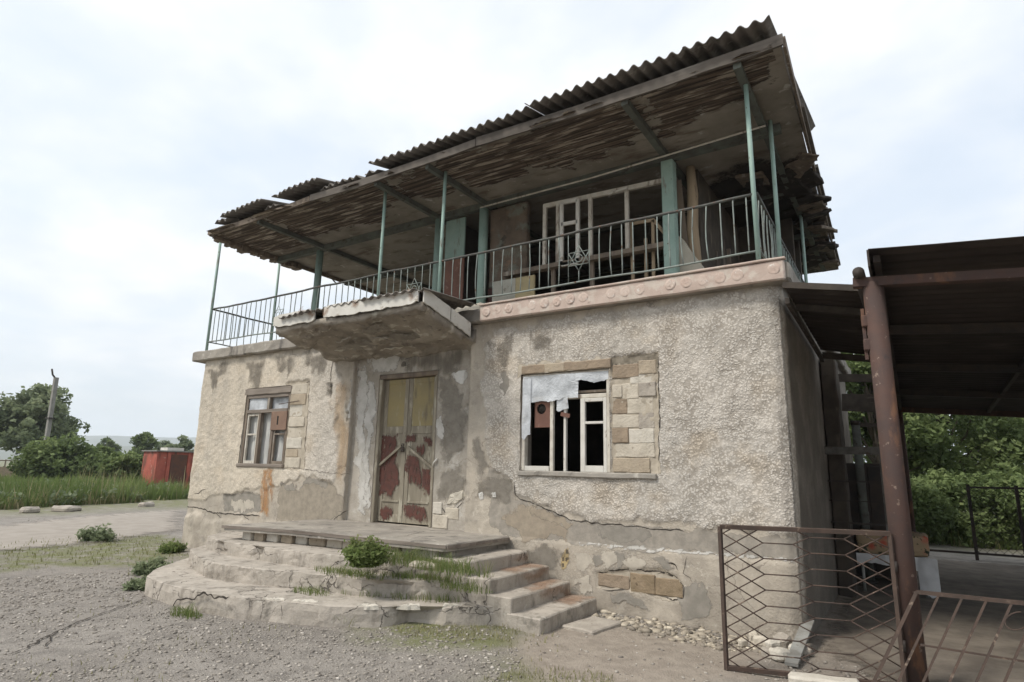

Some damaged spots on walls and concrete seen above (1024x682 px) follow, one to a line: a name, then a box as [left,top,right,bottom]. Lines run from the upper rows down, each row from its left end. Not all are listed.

leakage [249,363,262,388]
peeling [344,355,406,515]
crack [187,489,259,520]
corrosion [260,470,272,514]
crack [514,486,687,531]
flaking render [479,467,799,596]
crack [173,586,242,610]